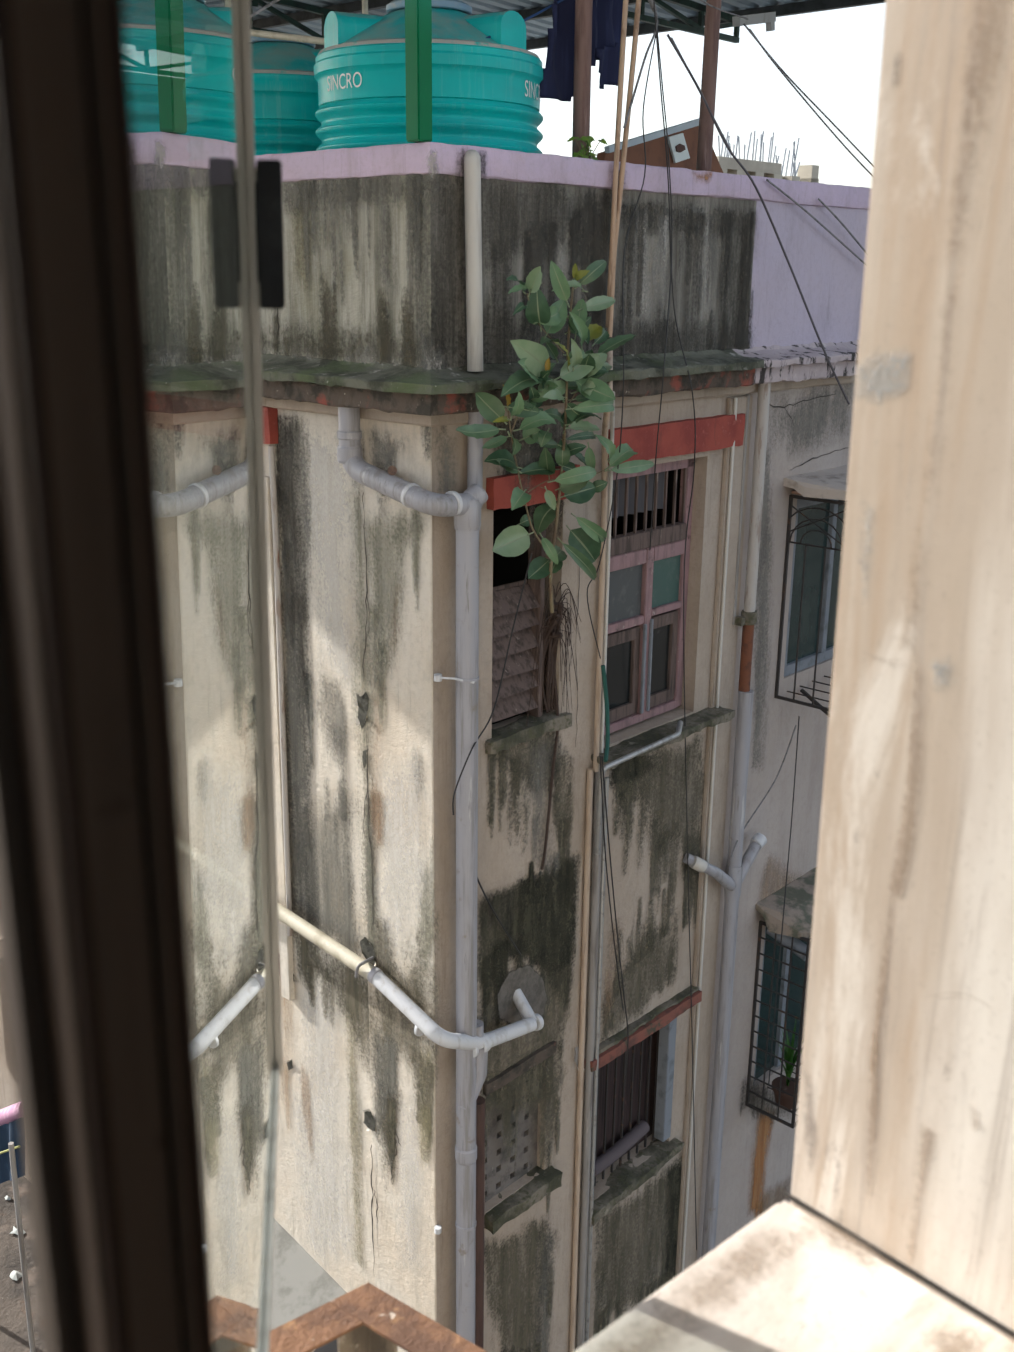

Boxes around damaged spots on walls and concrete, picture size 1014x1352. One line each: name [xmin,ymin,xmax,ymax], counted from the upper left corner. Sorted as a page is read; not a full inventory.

damp [283,152,466,370]
damp [480,155,755,364]
damp [275,417,422,954]
damp [488,739,571,904]
damp [605,771,697,1006]
damp [482,939,545,1033]
damp [307,964,362,1258]
crack [370,1100,401,1271]
damp [382,1052,433,1182]
rust [750,1110,786,1218]
damp [501,1237,554,1352]
damp [593,1287,621,1336]